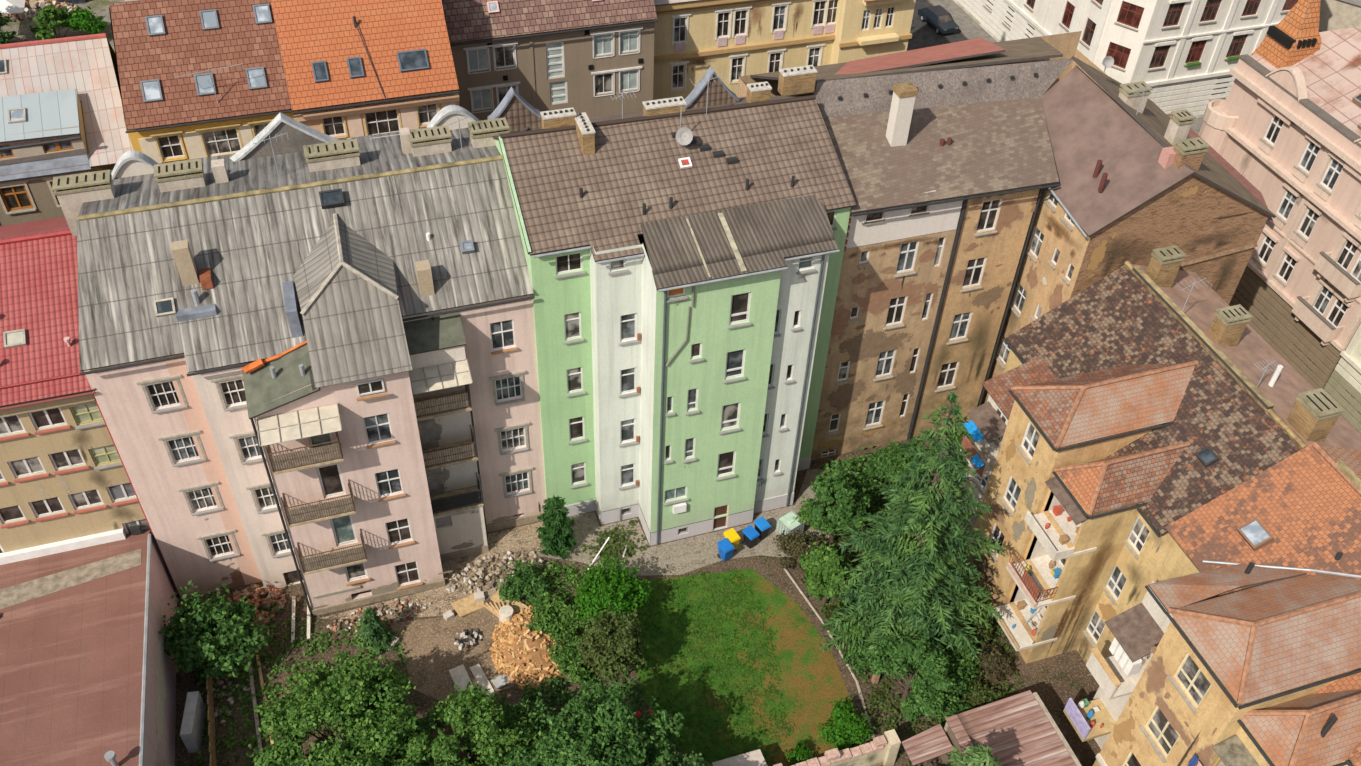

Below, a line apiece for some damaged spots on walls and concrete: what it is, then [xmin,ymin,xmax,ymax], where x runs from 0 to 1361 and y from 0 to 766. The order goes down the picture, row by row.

flaking render [1084,228,1117,289]
flaking render [818,194,1065,417]
flaking render [862,419,902,436]